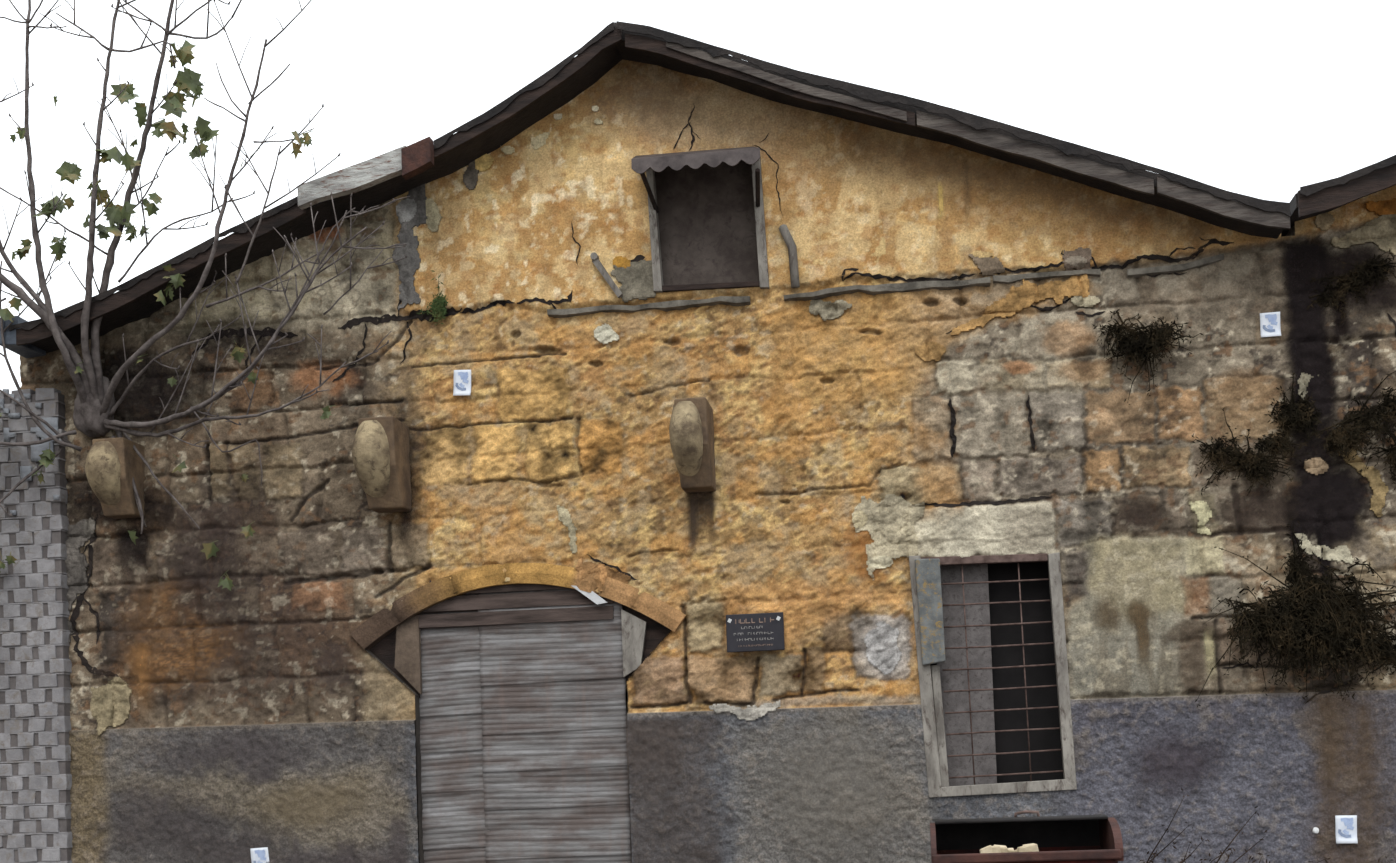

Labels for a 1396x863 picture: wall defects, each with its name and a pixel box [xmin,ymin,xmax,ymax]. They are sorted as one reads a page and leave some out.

spalling [392,183,442,310]
crack [630,254,645,262]
crack [842,237,1234,282]
peeling [915,247,1100,362]
crack [1007,297,1105,318]
spalling [1297,373,1319,400]
damp [1283,241,1369,592]
spalling [1304,447,1389,517]
spalling [1189,501,1212,535]
spalling [1295,533,1354,564]
crack [70,520,124,678]